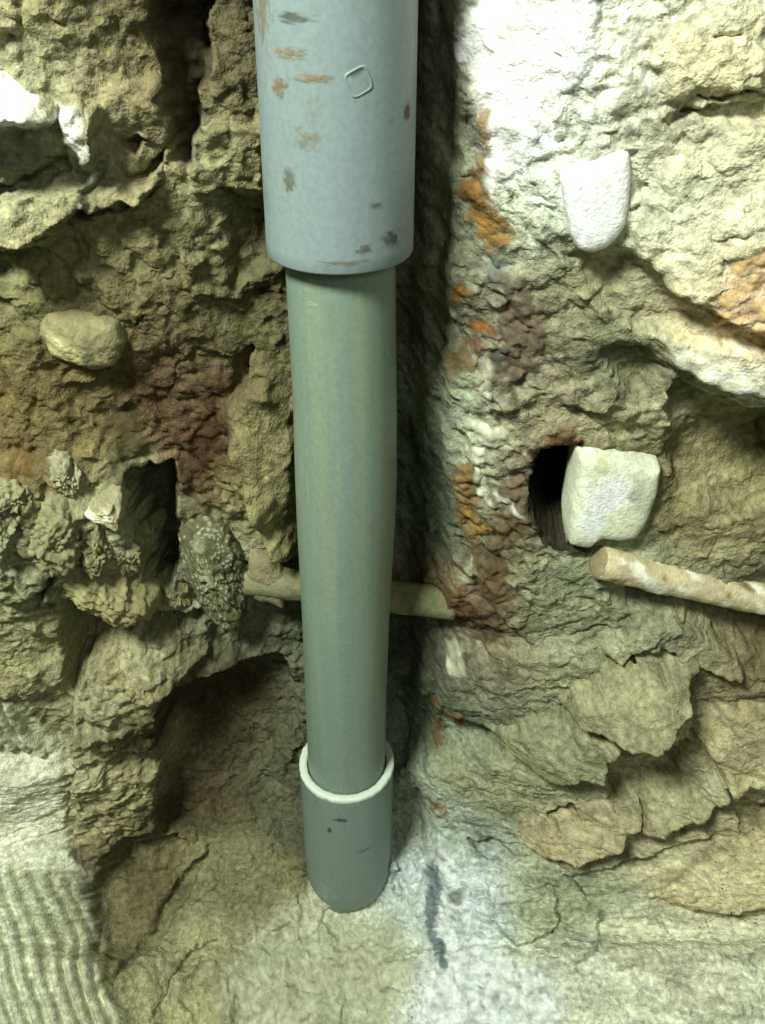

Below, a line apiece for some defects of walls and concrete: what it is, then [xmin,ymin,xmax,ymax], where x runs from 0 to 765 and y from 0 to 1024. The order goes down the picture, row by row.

rust [459,108,514,252]
rust [445,320,493,376]
spalling [134,458,182,567]
rust [451,464,494,563]
spalling [247,548,286,608]
rust [448,585,475,622]
leakage [216,811,566,1024]